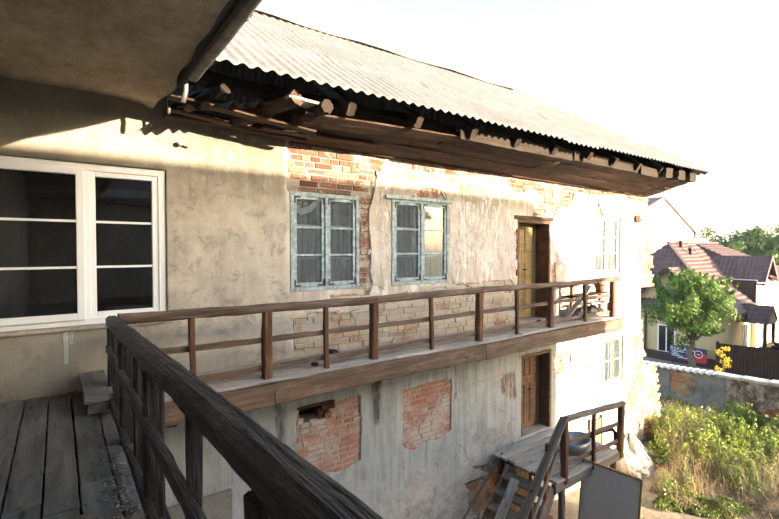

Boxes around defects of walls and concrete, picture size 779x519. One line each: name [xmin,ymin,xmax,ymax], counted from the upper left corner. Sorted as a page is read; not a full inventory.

flaking render [284,140,648,357]
flaking render [636,243,654,287]
flaking render [296,395,361,473]
flaking render [402,379,451,450]
flaking render [553,334,603,402]
flaking render [567,277,661,444]
flaking render [669,370,694,398]
flaking render [725,378,779,425]